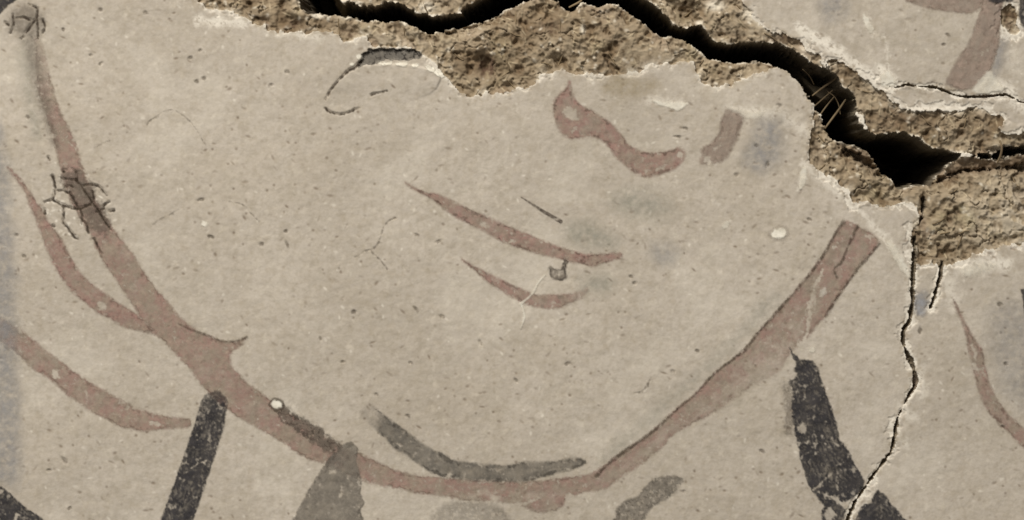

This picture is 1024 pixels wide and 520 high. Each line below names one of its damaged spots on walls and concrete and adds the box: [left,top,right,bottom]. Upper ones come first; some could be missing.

crack [44,157,115,247]
spalling [197,0,1024,276]
crack [299,0,1024,520]